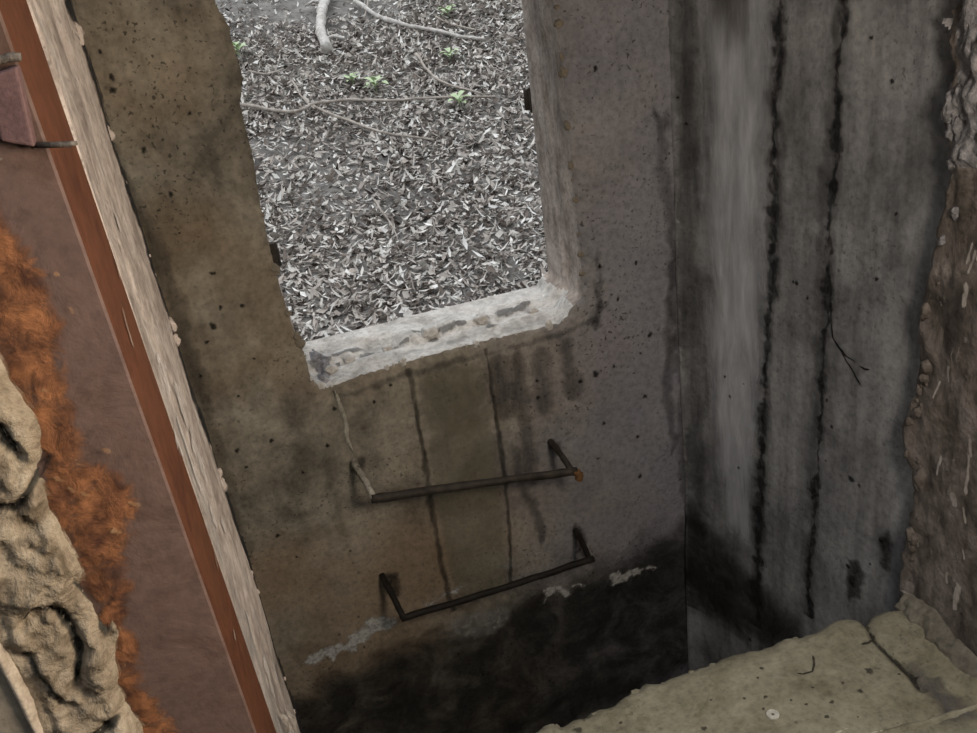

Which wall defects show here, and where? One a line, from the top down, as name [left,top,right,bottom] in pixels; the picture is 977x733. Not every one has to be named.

rust [0,219,175,733]
water stain [292,514,794,733]
crack [750,1,784,627]
crack [806,0,869,619]
spalling [940,0,977,170]